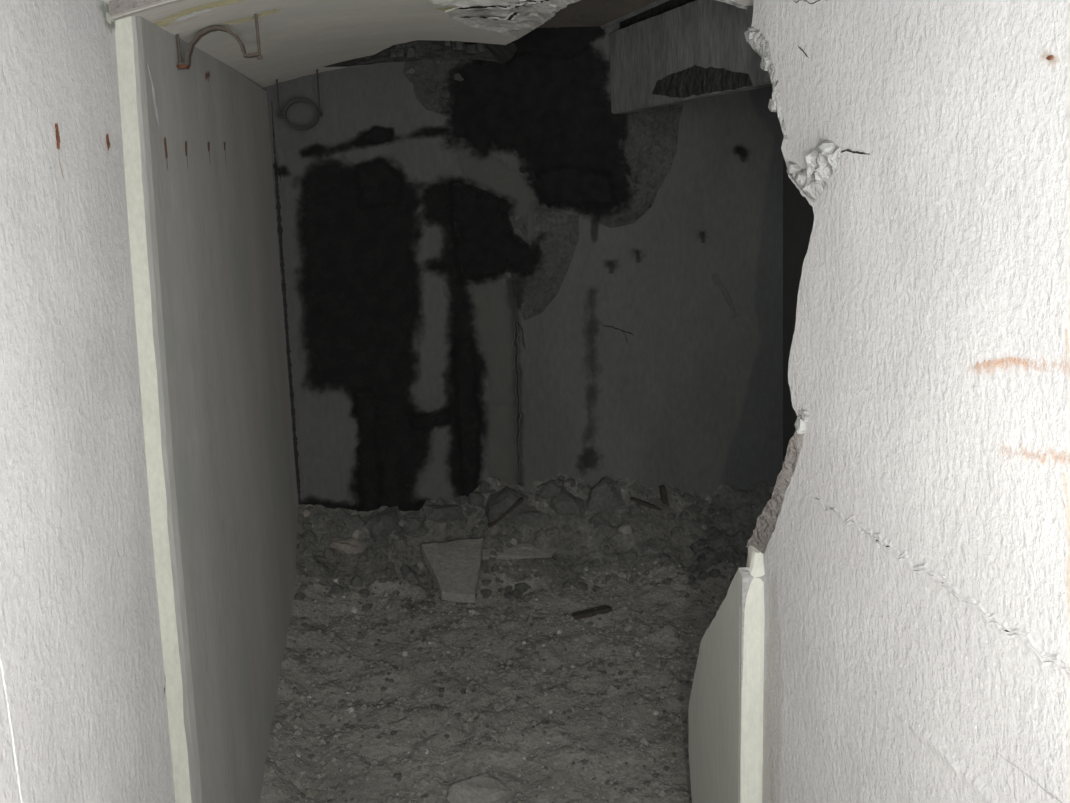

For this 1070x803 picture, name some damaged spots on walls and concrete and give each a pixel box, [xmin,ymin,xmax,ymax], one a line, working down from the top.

spalling [325,0,580,114]
water stain [511,26,605,59]
spalling [716,0,747,10]
spalling [746,27,788,139]
spalling [593,65,753,228]
spalling [786,139,870,202]
water stain [297,127,617,512]
spalling [511,208,579,321]
spalling [745,410,810,554]